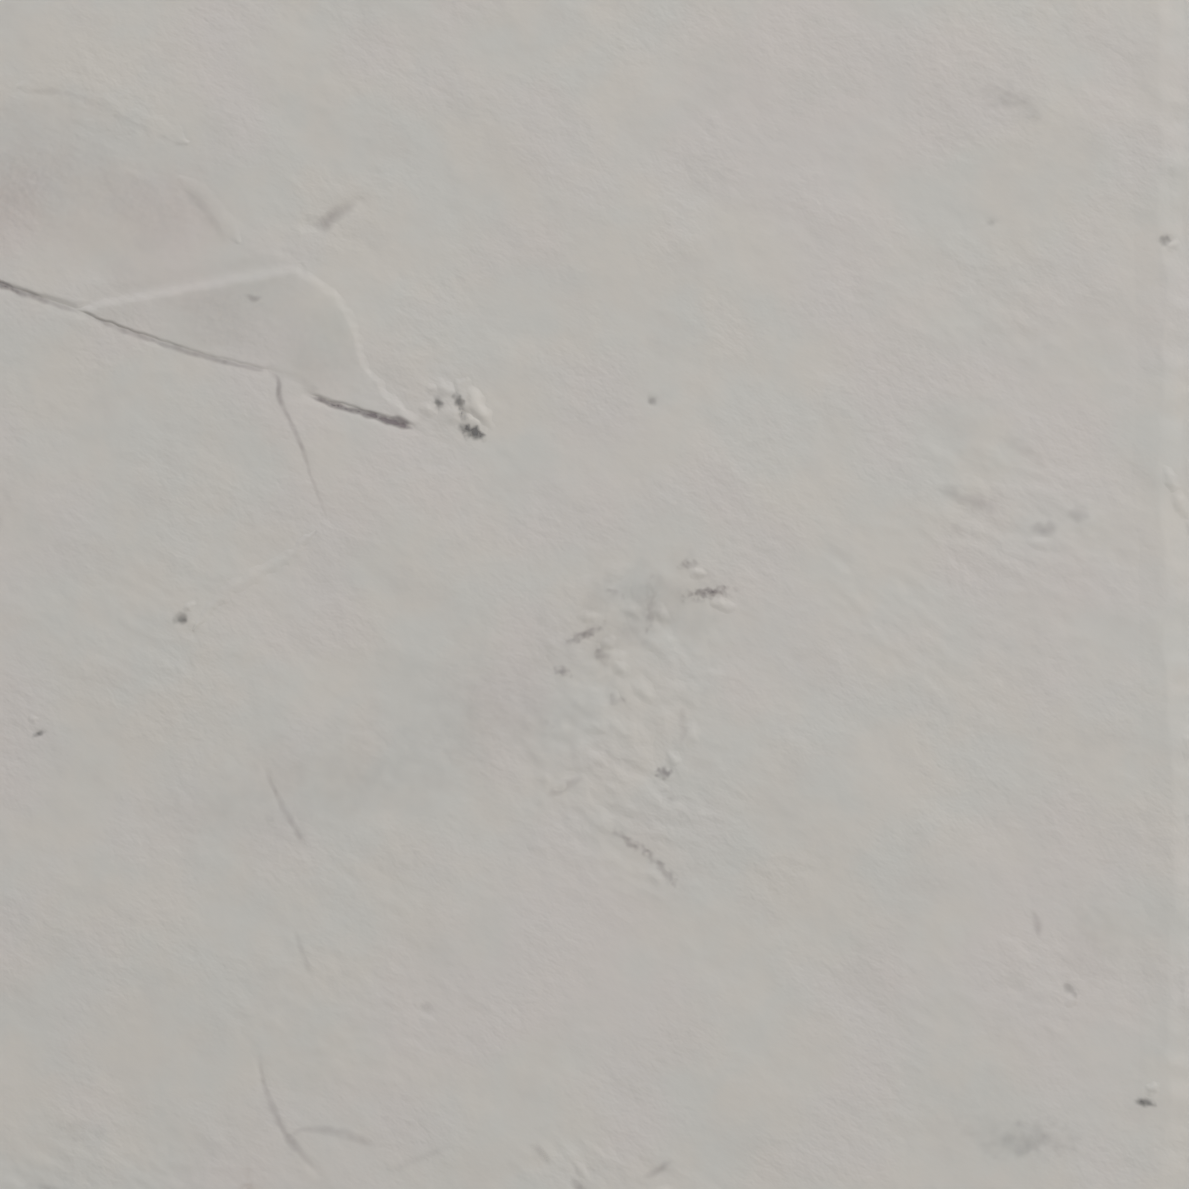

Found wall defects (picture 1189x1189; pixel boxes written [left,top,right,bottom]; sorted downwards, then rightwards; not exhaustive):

crack [331,404,406,428]